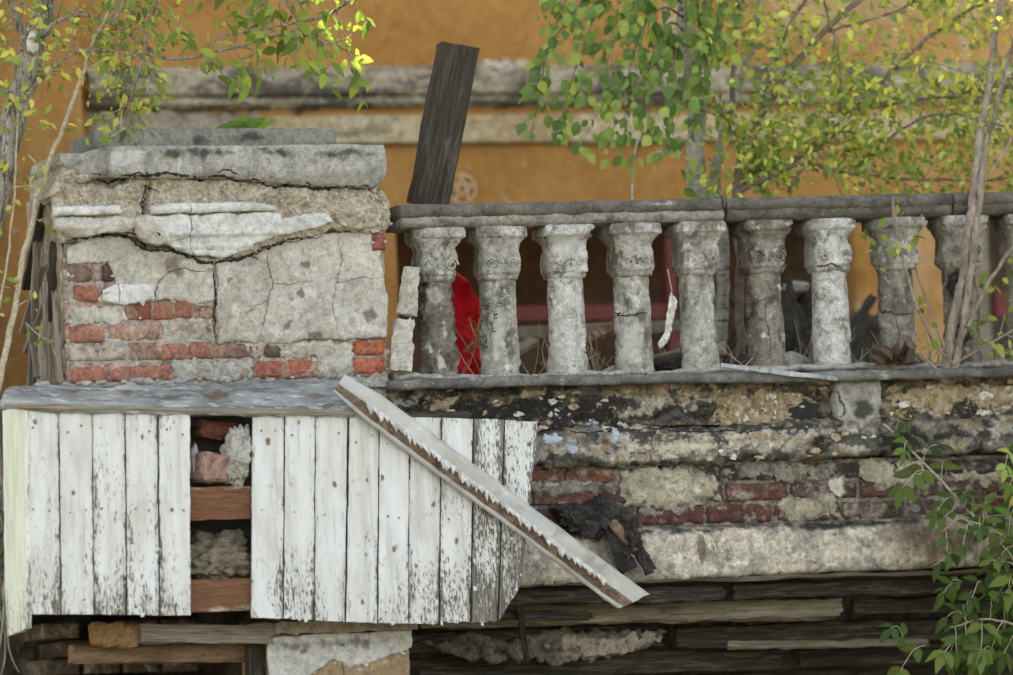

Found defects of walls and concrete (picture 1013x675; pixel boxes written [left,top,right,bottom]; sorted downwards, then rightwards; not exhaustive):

crack [58,169,382,342]
spalling [66,258,115,302]
spalling [134,297,199,323]
spalling [66,320,105,345]
spalling [72,337,213,386]
spalling [223,341,317,380]
leakage [414,390,634,428]
leakage [953,398,987,418]